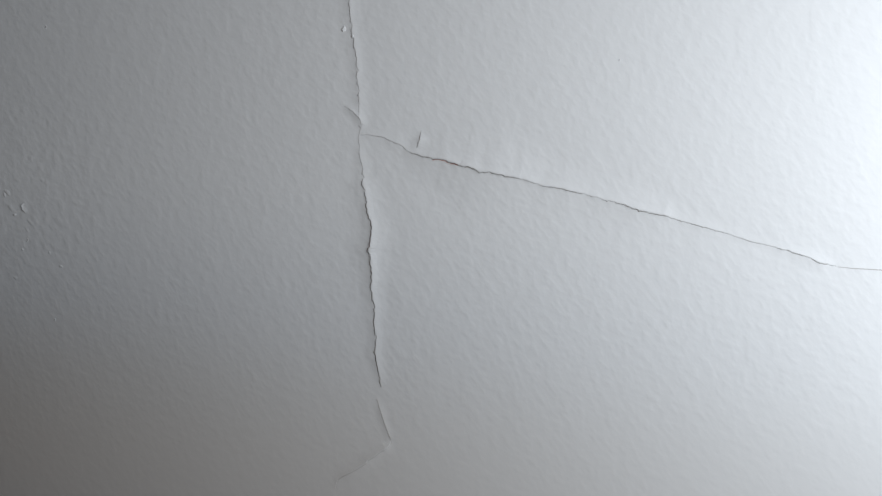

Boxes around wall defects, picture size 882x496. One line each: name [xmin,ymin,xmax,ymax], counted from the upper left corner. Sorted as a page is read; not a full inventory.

crack [330,0,882,489]